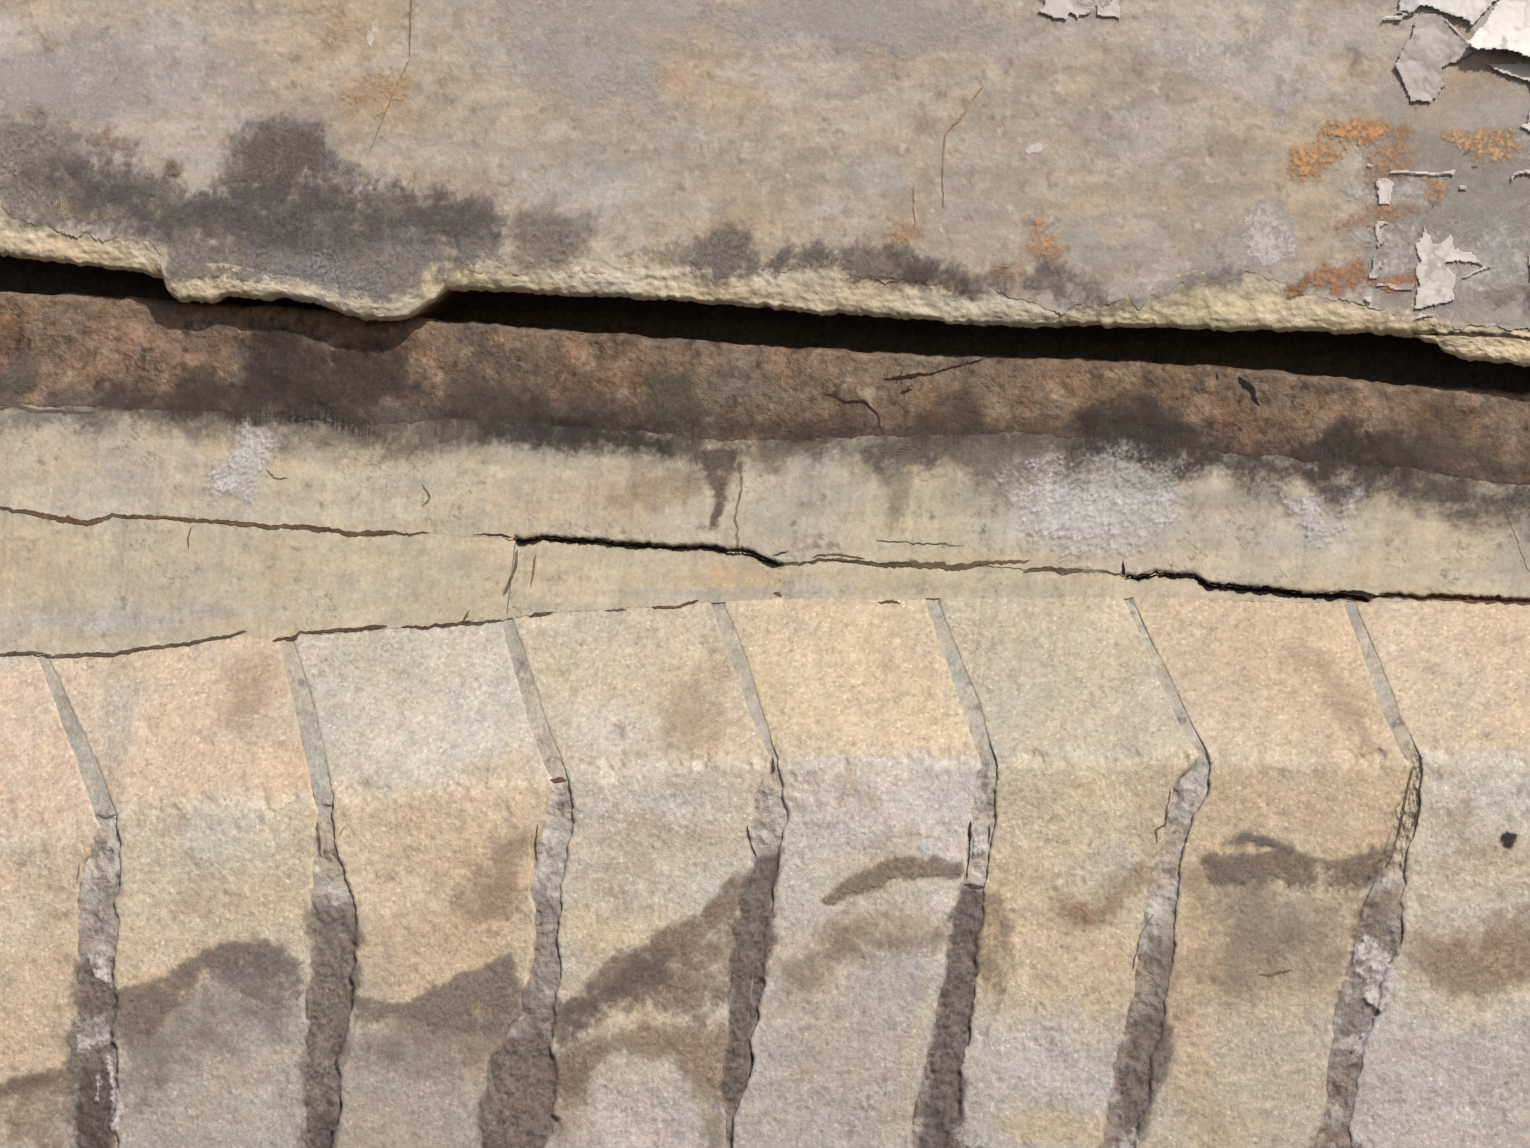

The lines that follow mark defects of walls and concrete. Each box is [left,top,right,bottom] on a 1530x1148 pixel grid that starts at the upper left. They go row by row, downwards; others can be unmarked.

peeling [1038,0,1120,19]
peeling [1383,0,1530,103]
water stain [0,107,596,304]
rust [1288,116,1450,228]
rust [1442,127,1523,162]
rust [1284,257,1417,298]
crack [1451,332,1530,341]
crack [824,354,989,434]
crack [0,459,1530,658]
water stain [1199,832,1401,1011]
water stain [0,835,784,1148]
water stain [787,820,1012,1148]